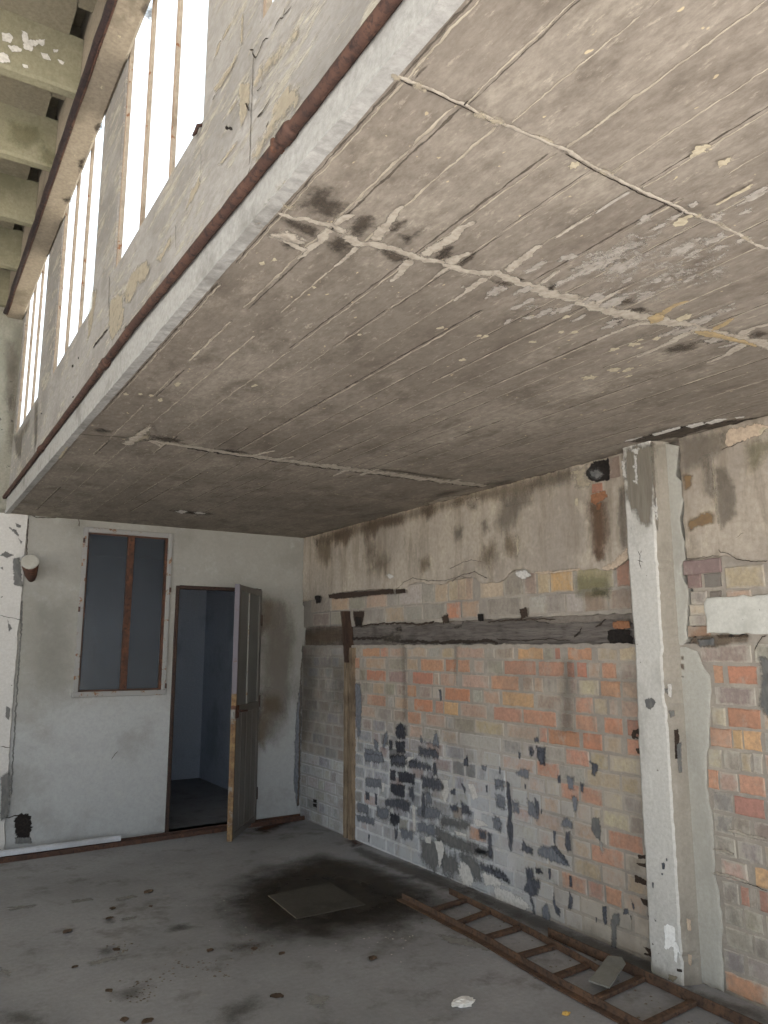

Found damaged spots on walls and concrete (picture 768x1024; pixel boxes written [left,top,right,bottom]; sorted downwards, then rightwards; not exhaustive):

peeling [0,30,64,68]
leakage [286,220,316,237]
leakage [302,188,341,217]
leakage [327,216,374,251]
crack [278,205,768,364]
crack [391,74,768,250]
peeling [484,184,768,334]
crack [83,427,488,487]
leakage [316,473,570,579]
spalling [571,458,628,571]
spalling [712,423,768,523]
spalling [635,855,667,888]